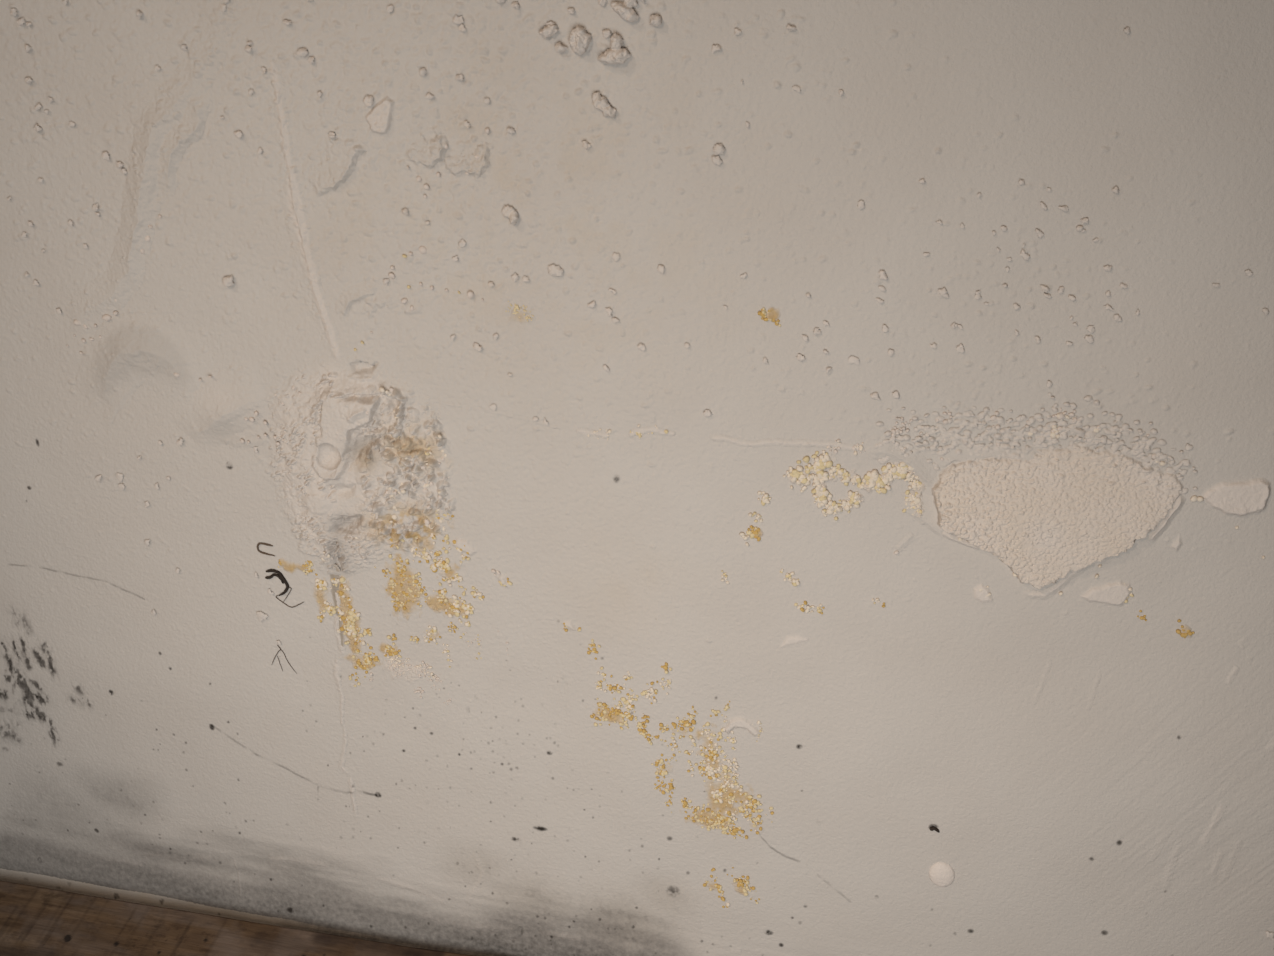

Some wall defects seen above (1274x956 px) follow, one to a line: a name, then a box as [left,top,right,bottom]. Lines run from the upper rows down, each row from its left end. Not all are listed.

spalling [265,354,460,578]
water stain [783,450,926,521]
water stain [278,509,485,705]
water stain [0,602,774,956]